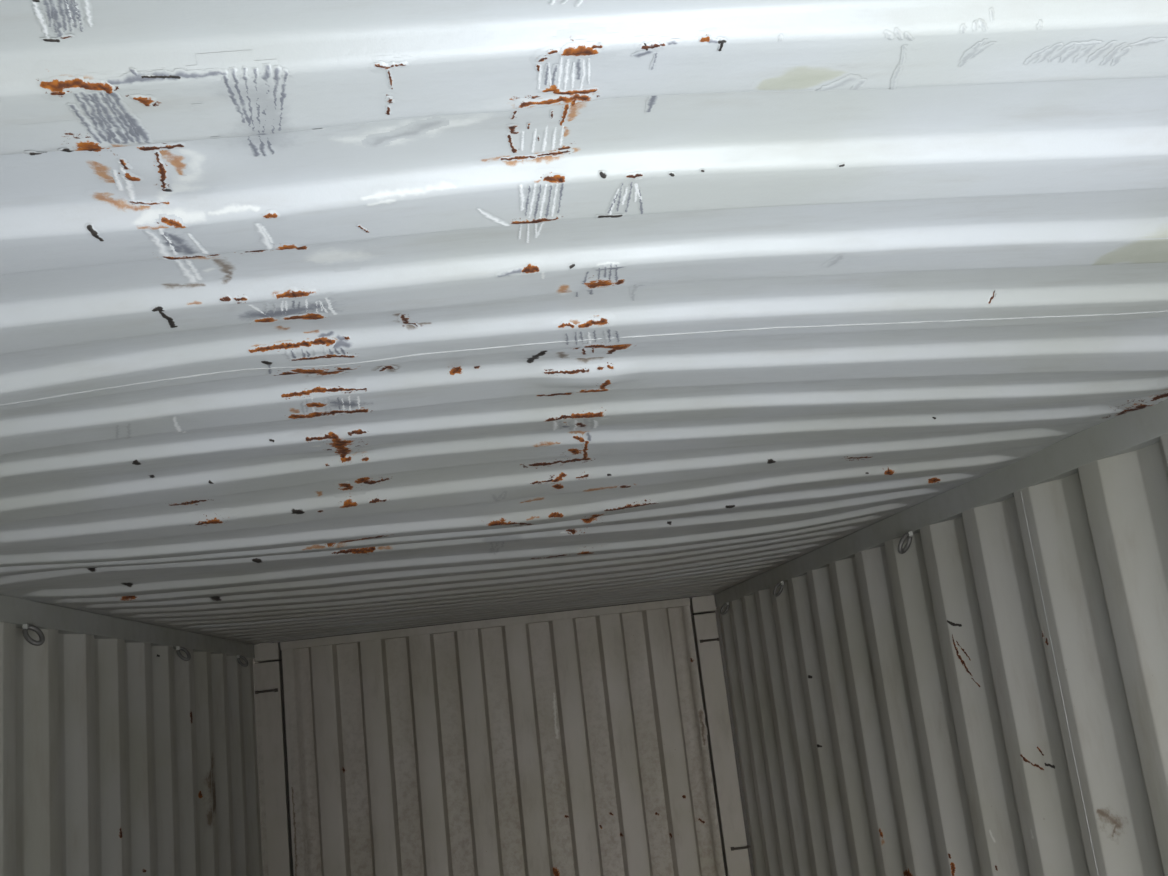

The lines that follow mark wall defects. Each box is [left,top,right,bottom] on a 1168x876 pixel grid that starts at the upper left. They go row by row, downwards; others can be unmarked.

rust [26,60,179,112]
rust [475,22,728,186]
rust [18,120,199,233]
rust [251,203,292,223]
rust [230,236,324,260]
rust [184,275,326,307]
rust [495,254,638,297]
rust [387,311,435,336]
rust [232,313,409,515]
rust [471,310,662,561]
rust [1088,374,1168,421]
rust [297,523,402,559]